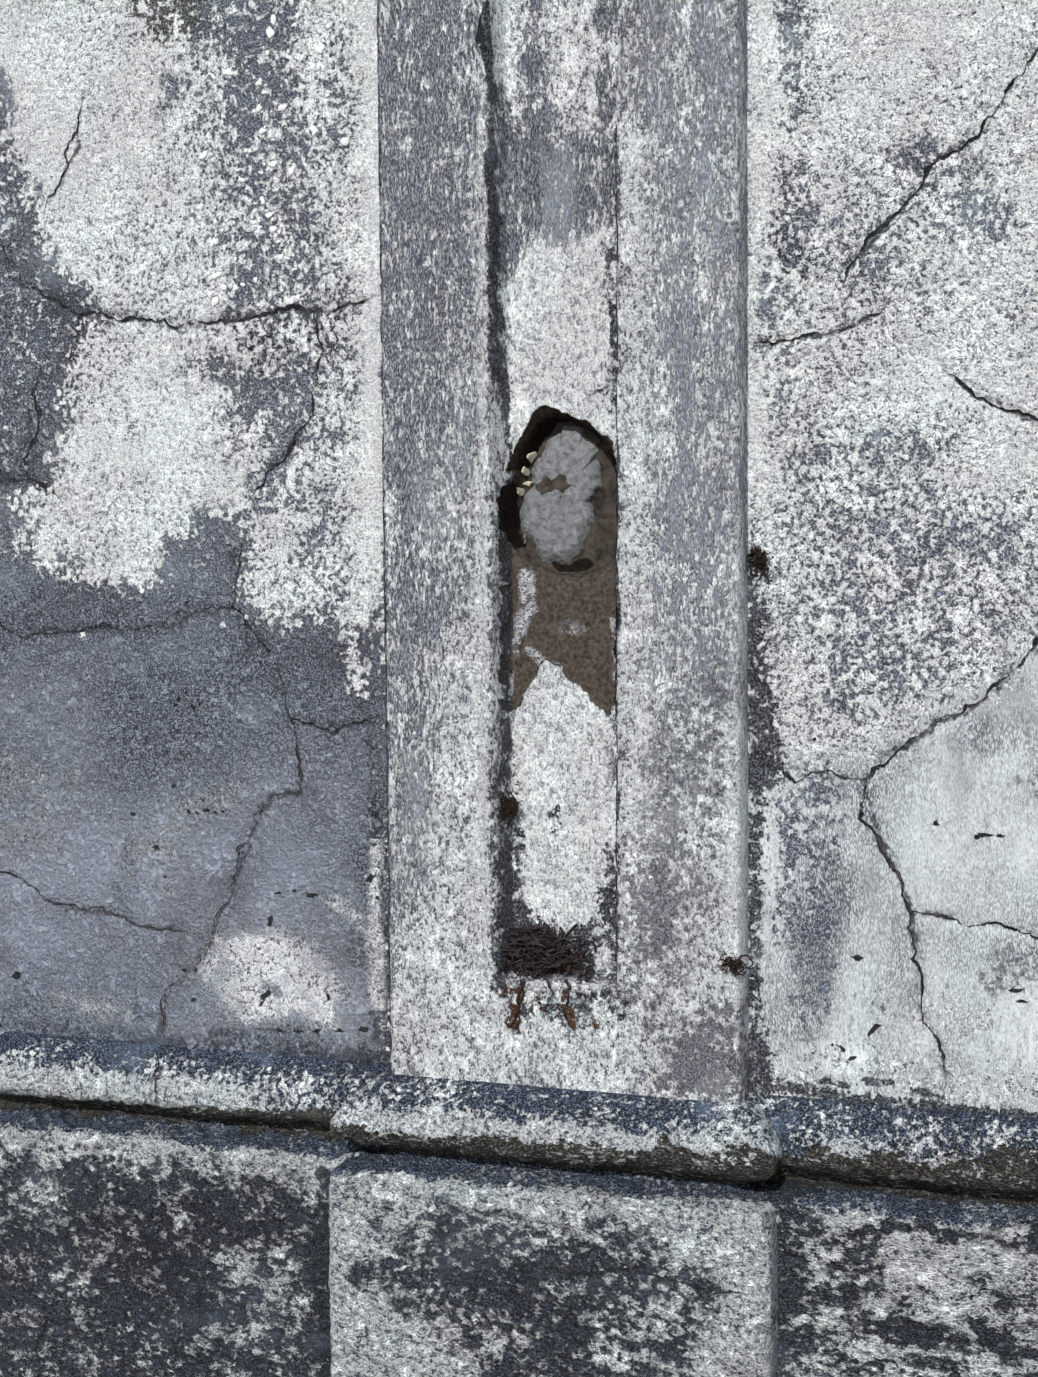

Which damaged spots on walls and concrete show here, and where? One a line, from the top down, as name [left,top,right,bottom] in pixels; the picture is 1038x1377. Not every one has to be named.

crack [45,91,84,208]
crack [842,49,1038,287]
crack [0,240,379,500]
crack [757,308,884,345]
crack [942,368,1038,421]
spalling [496,405,619,717]
crack [0,539,374,1102]
crack [756,637,1038,1100]
corrosion [503,977,600,1034]